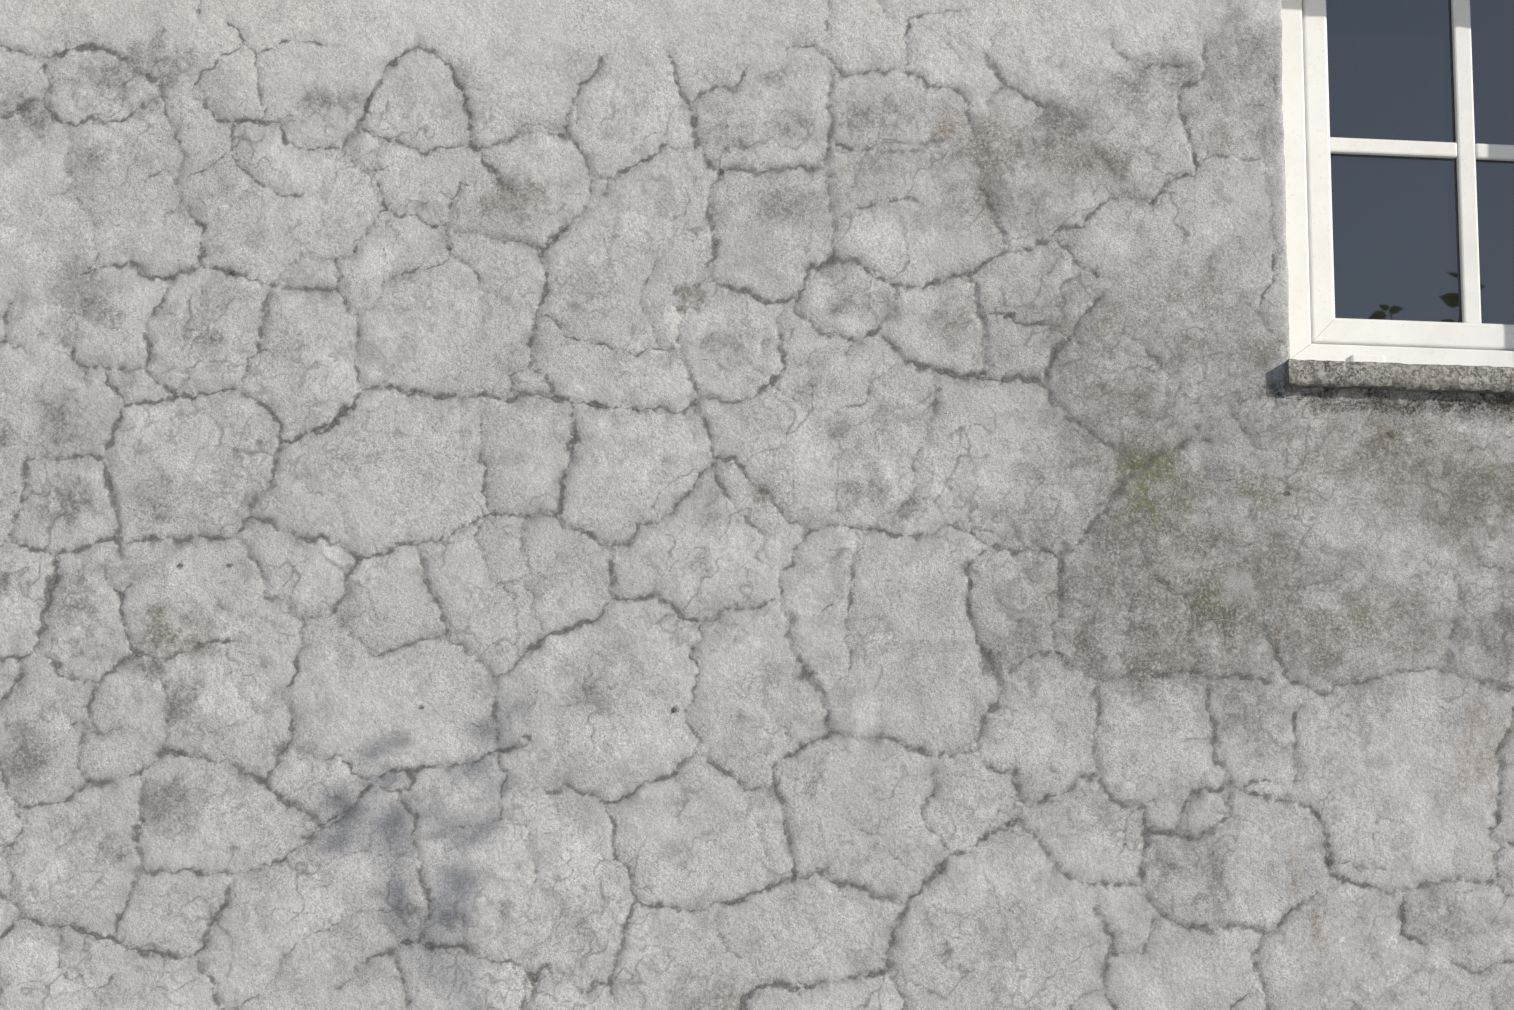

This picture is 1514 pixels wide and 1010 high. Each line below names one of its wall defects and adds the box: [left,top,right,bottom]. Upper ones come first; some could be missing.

crack [1,22,513,280]
crack [549,56,666,196]
crack [669,2,973,223]
crack [699,43,1266,741]
crack [0,211,1457,1010]
damp [1096,502,1236,637]
crack [1422,679,1514,896]